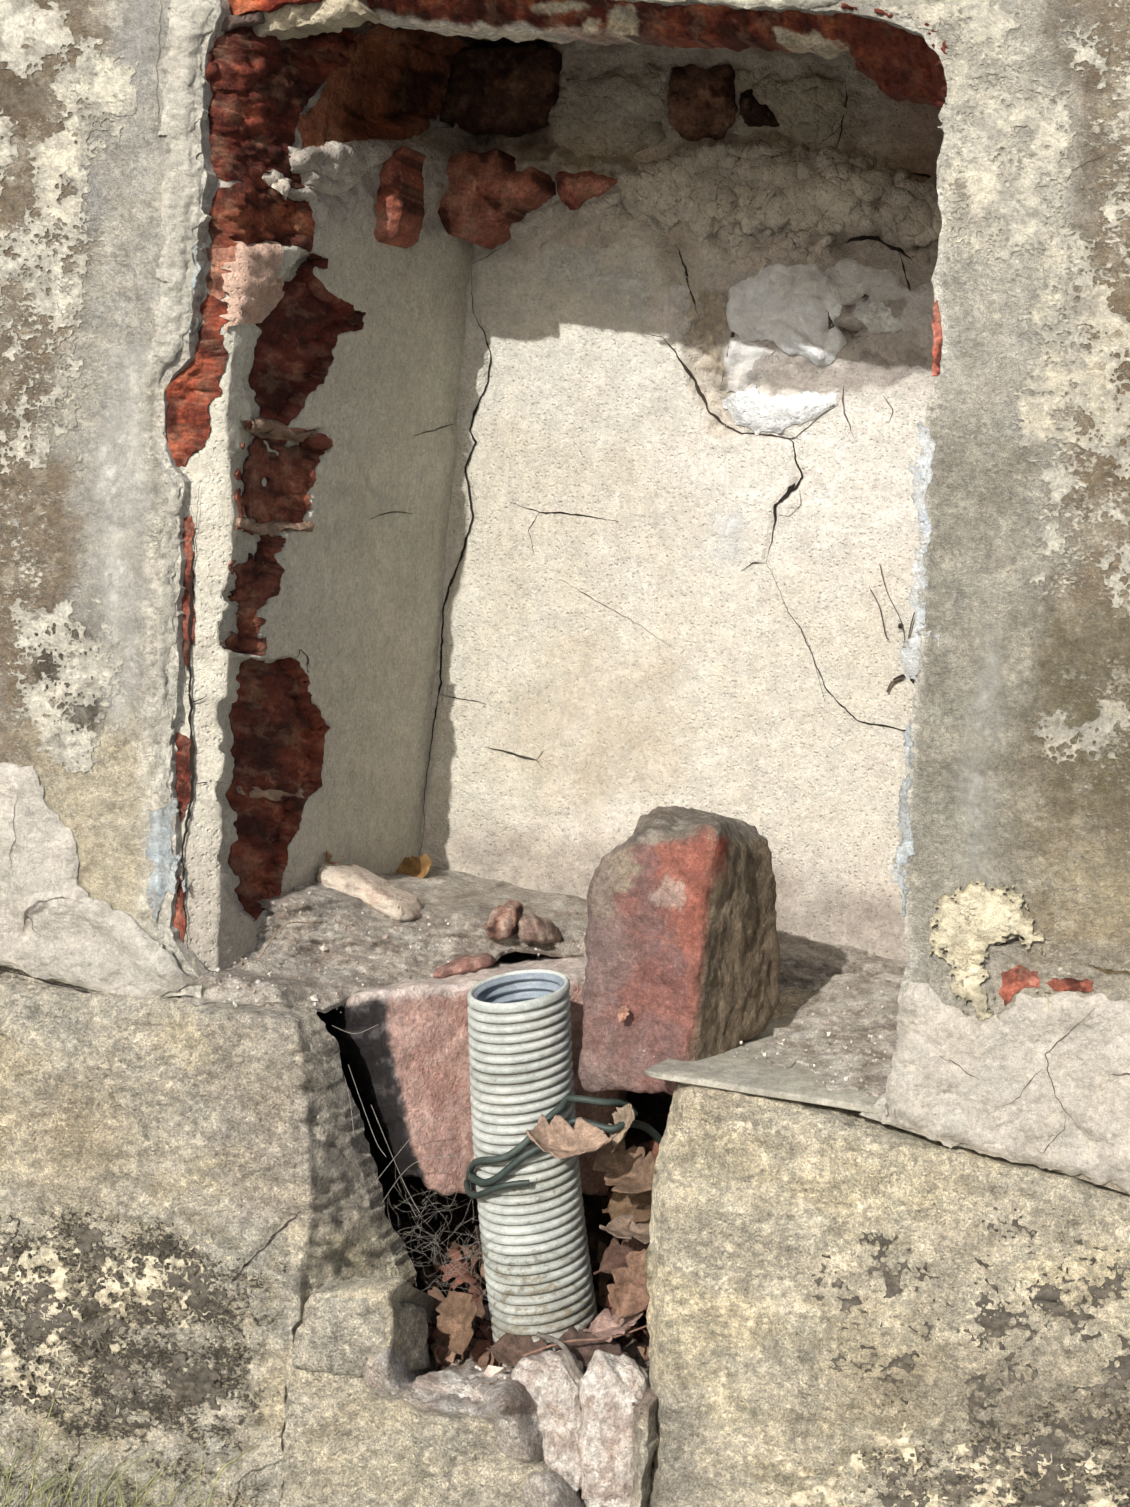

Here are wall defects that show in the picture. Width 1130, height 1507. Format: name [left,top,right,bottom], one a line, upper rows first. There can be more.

spalling [667,64,780,141]
flaking render [649,285,691,340]
crack [840,236,913,290]
water stain [98,352,144,514]
spalling [145,0,617,942]
crack [414,248,501,856]
crack [646,246,906,731]
peeling [900,421,940,681]
water stain [35,626,134,734]
crack [484,746,544,768]
peeling [889,725,1093,1025]